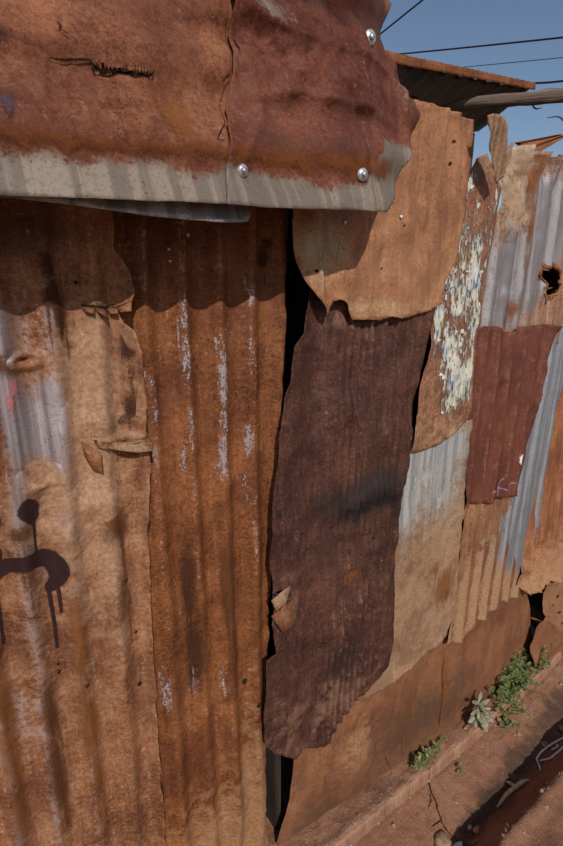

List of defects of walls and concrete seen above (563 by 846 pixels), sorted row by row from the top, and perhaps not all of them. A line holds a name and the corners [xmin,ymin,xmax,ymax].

crack [49,57,155,75]
corrosion [234,143,387,178]
corrosion [39,253,70,355]
peeling [430,151,534,419]
corrosion [0,354,29,374]
corrosion [120,336,136,358]
corrosion [118,389,137,424]
peeling [94,437,158,463]
corrosion [106,510,127,557]
corrosion [180,548,205,691]
corrosion [0,669,29,833]
corrosion [42,690,71,821]